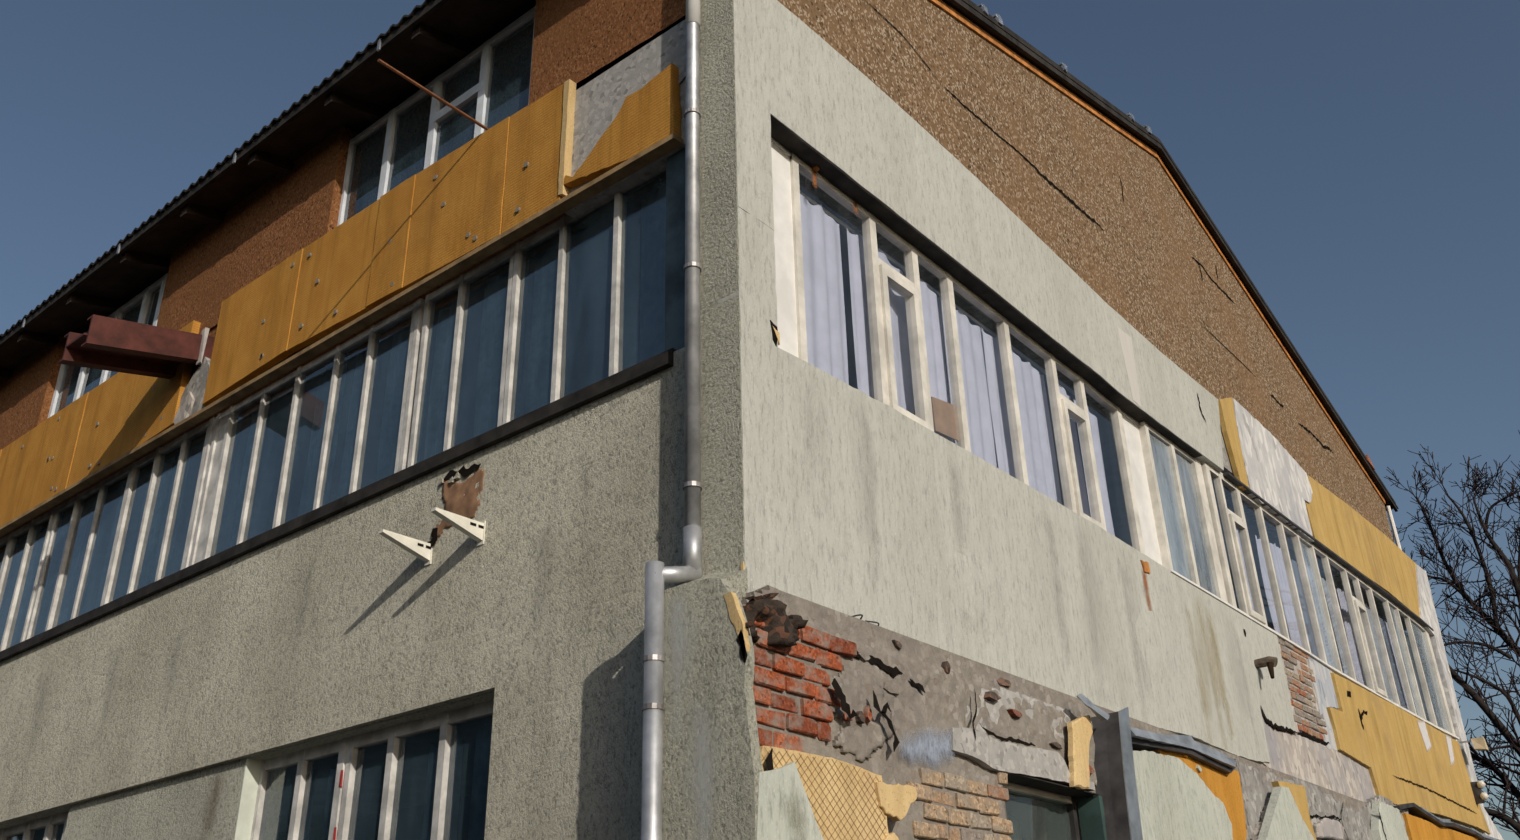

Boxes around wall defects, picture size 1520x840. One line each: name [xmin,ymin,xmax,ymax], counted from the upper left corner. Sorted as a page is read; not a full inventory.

crack [867,2,1124,230]
peeling [842,705,872,724]
peeling [965,678,1071,752]
flaking render [1261,637,1330,745]
peeling [874,782,917,840]
flaking render [1149,750,1409,840]